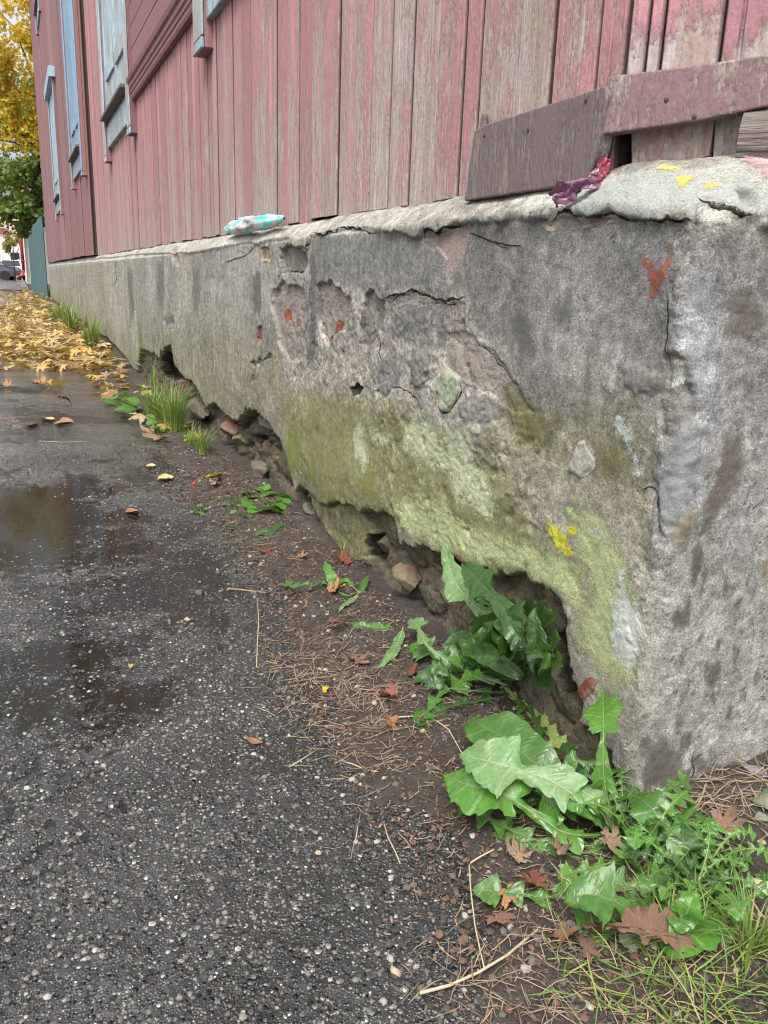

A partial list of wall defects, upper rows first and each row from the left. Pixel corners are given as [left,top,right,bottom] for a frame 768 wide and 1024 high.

crack [549,198,753,223]
crack [423,225,520,248]
flaking render [261,246,308,274]
flaking render [284,308,302,326]
flaking render [316,280,385,350]
crack [386,288,465,306]
crack [663,295,671,366]
flaking render [349,383,364,396]
peeling [377,353,430,395]
damp [611,413,645,477]
crack [644,486,661,530]
damp [609,565,644,670]